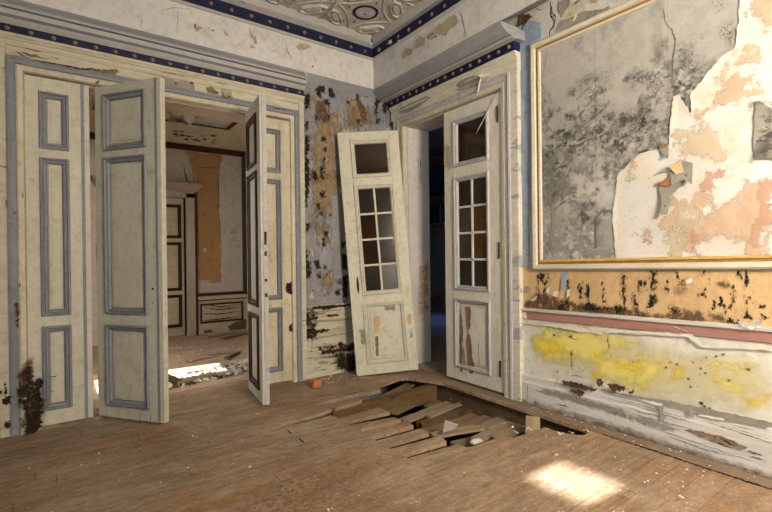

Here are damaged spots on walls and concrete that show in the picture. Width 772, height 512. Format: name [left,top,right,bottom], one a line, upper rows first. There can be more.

peeling [402,15,458,60]
crack [526,1,556,103]
crack [663,8,676,87]
peeling [168,112,217,143]
peeling [658,161,693,215]
damp [523,270,769,324]
spalling [306,303,395,372]
damp [534,328,665,386]
spalling [0,360,58,435]
peeling [537,378,772,430]